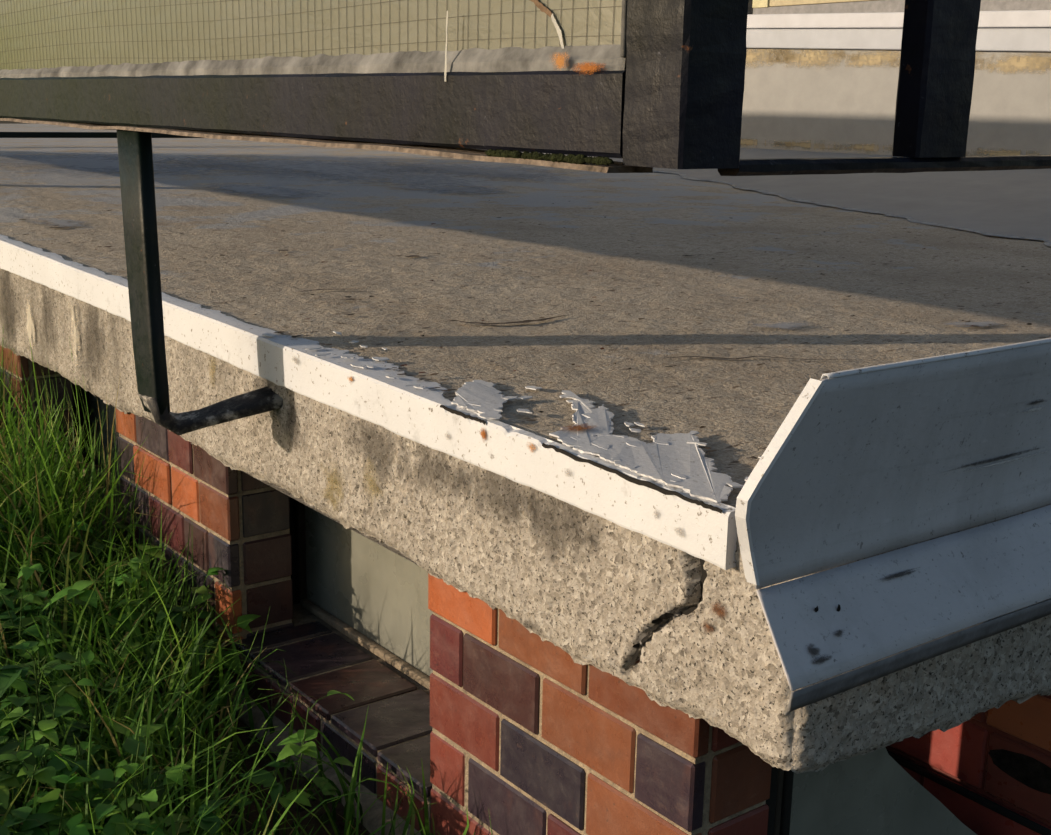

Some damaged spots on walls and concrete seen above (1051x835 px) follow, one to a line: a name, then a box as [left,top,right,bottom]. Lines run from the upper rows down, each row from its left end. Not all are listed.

crack [530,0,564,49]
rust [553,54,600,73]
peeling [549,390,748,504]
crack [625,558,707,671]